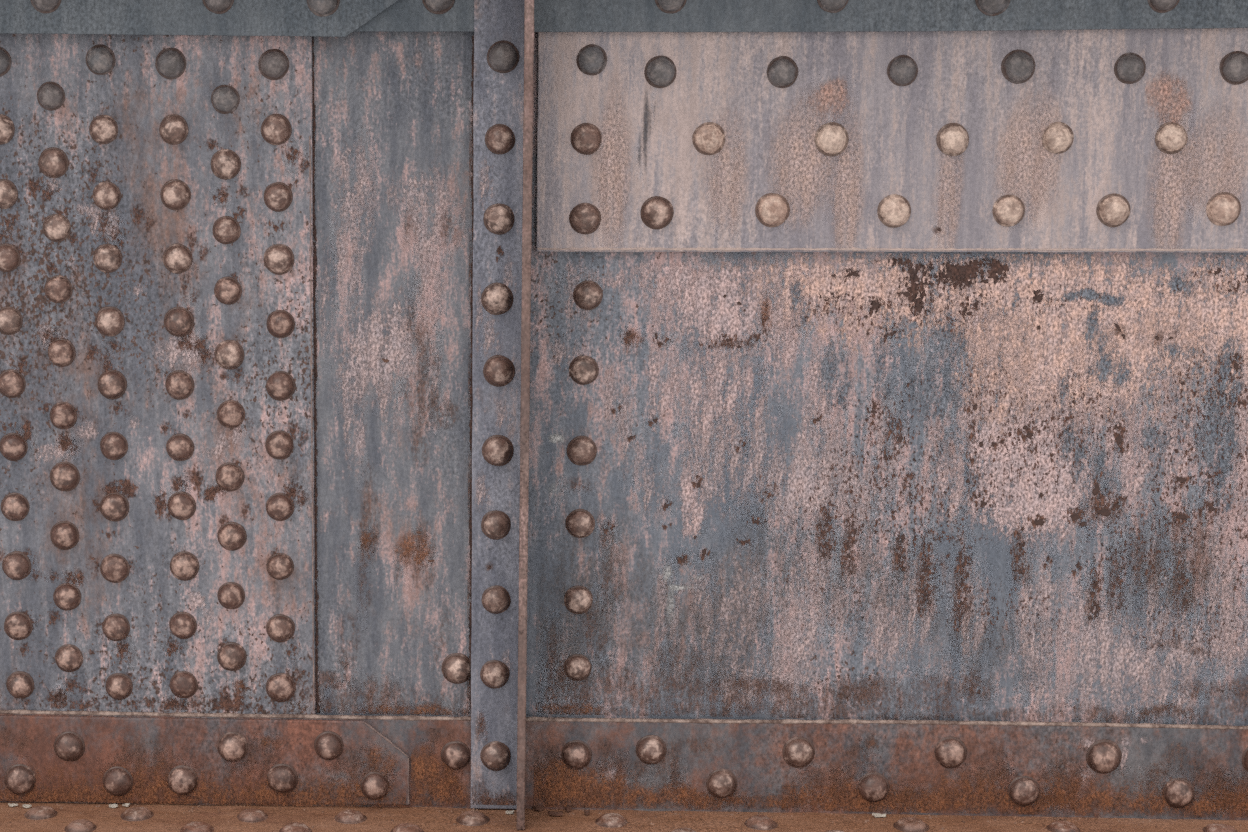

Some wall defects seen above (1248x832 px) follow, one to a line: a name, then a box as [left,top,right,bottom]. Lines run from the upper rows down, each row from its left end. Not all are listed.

corrosion [177,326,248,384]
corrosion [866,402,906,493]
corrosion [964,395,1037,510]
corrosion [1107,410,1129,458]
corrosion [155,464,224,520]
corrosion [1063,471,1127,527]
corrosion [1164,443,1220,533]
corrosion [816,501,860,578]
corrosion [892,533,935,617]
corrosion [1010,514,1052,580]
corrosion [1071,555,1154,620]
corrosion [47,679,276,712]